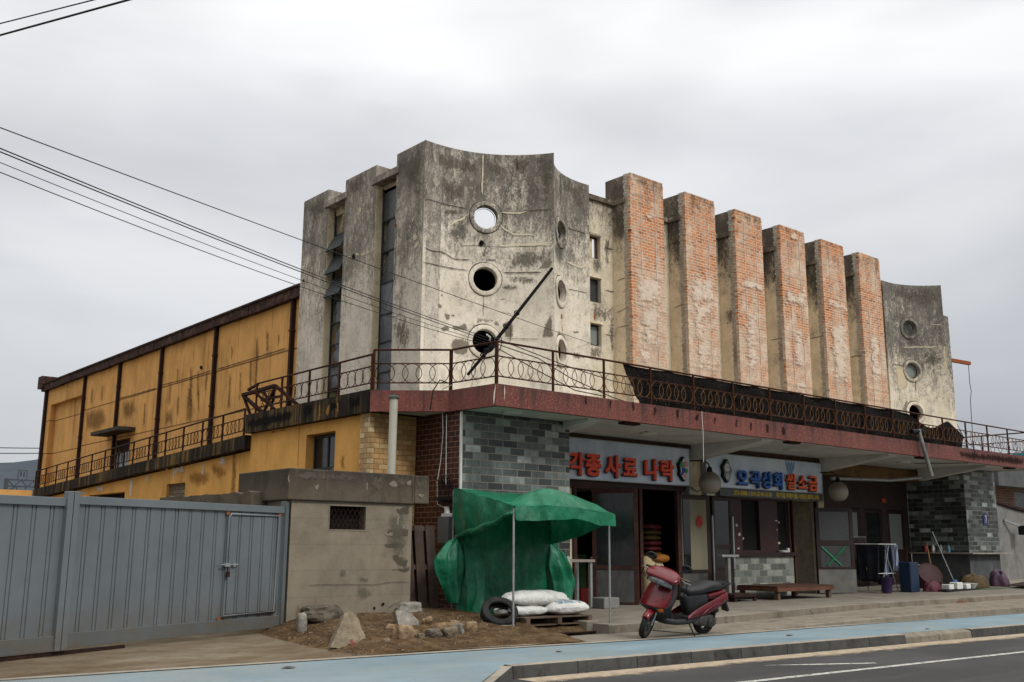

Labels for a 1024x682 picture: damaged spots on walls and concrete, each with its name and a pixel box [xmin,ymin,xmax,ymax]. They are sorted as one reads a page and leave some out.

water stain [432,154,476,171]
water stain [515,158,583,205]
water stain [445,210,468,239]
water stain [394,319,409,348]
water stain [501,248,562,300]
peeling [636,275,661,360]
peeling [692,273,714,369]
peeling [746,313,759,368]
peeling [786,287,807,306]
peeling [828,300,848,381]
water stain [248,411,291,426]
peeling [385,506,409,572]